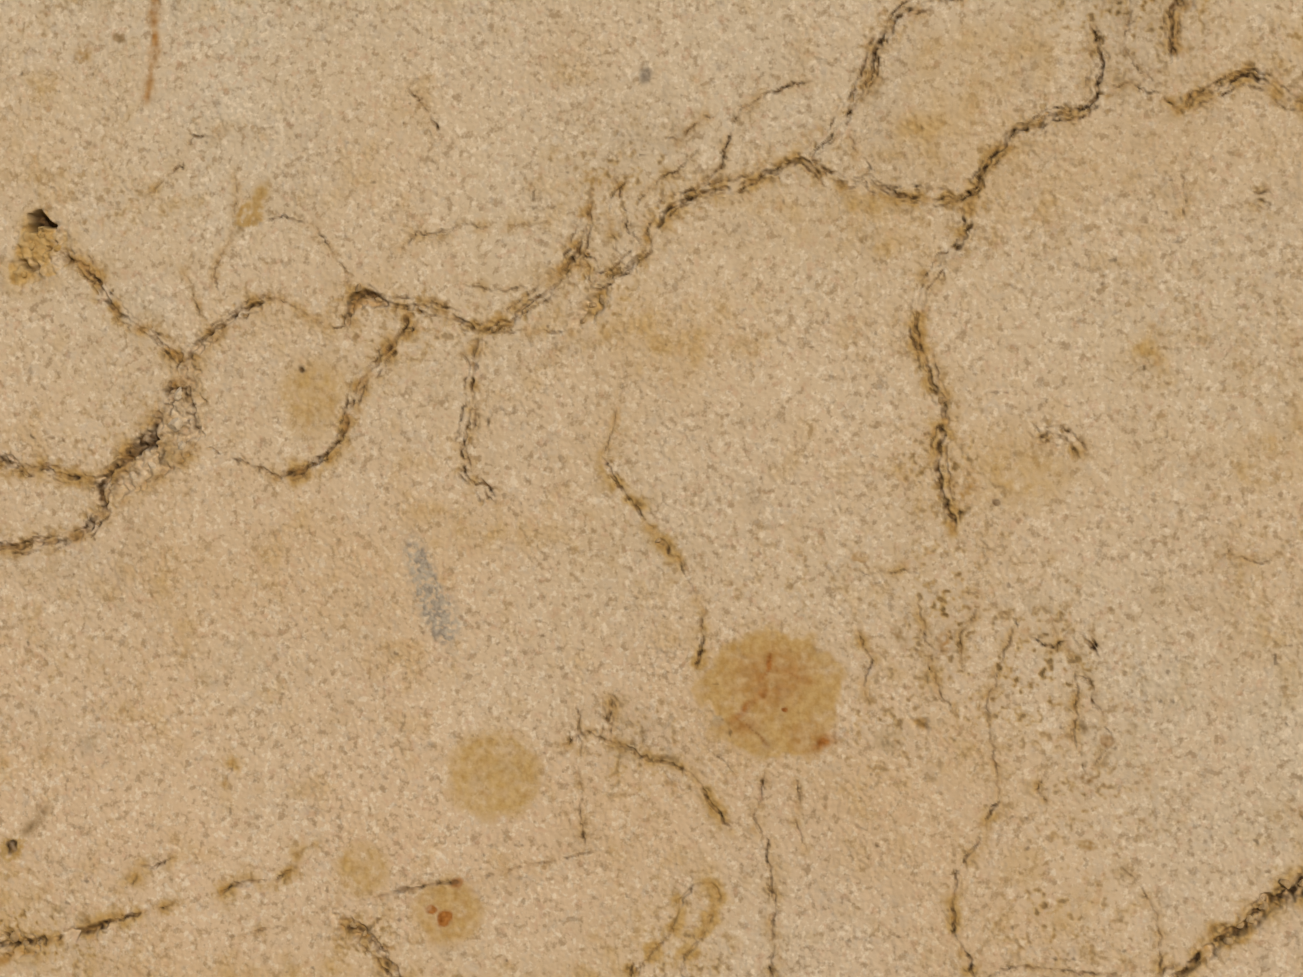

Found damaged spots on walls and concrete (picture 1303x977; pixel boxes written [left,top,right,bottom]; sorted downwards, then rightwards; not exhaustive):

corrosion [142,0,164,107]
spalling [4,209,74,293]
crack [0,0,1303,569]
spalling [93,326,213,506]
crack [599,374,708,673]
crack [1195,534,1276,579]
corrosion [406,870,492,956]
leakage [441,724,547,827]
crack [215,689,809,977]
crack [846,567,1303,977]